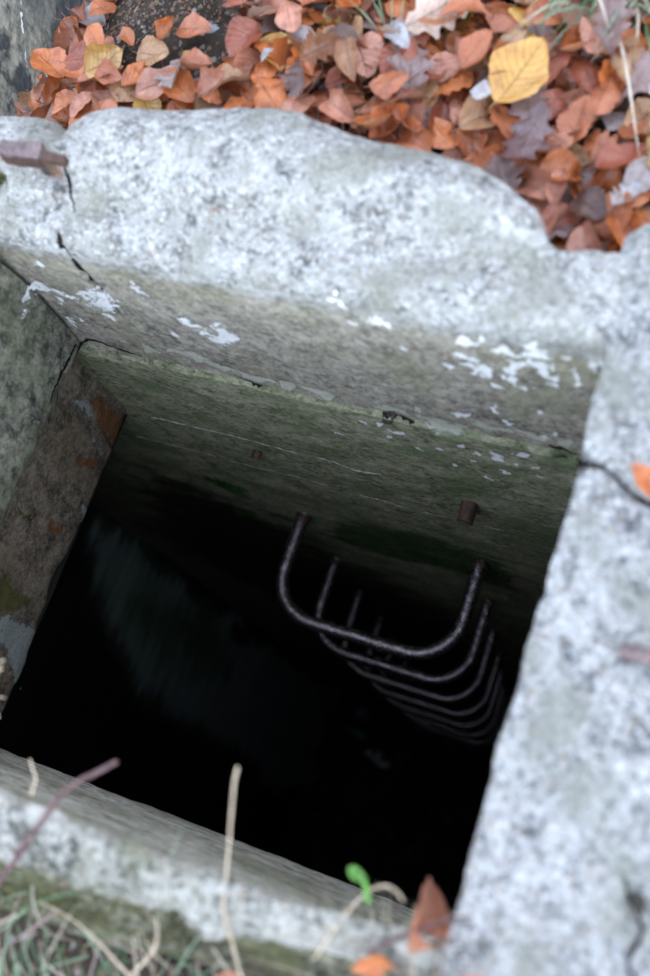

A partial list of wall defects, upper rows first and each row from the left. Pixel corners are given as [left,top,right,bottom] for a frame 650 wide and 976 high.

crack [63,167,75,213]
crack [56,232,180,344]
crack [49,338,140,404]
crack [377,408,415,425]